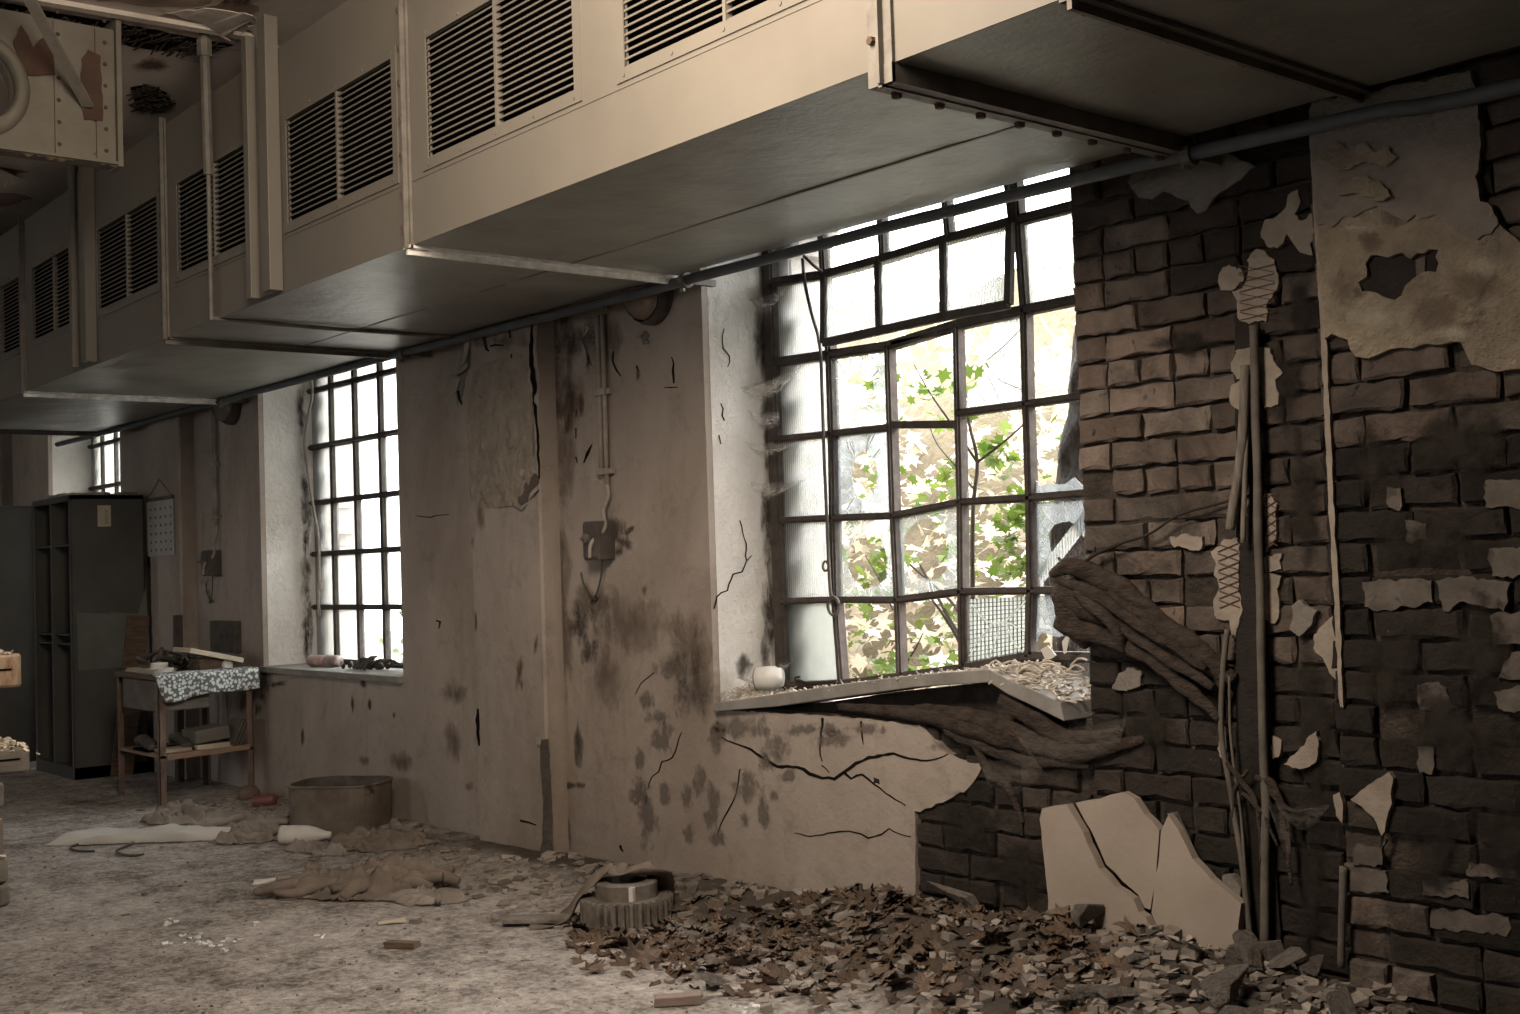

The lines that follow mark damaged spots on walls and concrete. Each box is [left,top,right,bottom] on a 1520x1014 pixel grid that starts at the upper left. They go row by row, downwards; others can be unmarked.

peeling [96,0,259,47]
spalling [1361,249,1438,300]
flaking render [1483,479,1520,509]
crack [713,520,752,609]
damp [560,540,644,683]
damp [738,573,774,676]
flaking render [1362,547,1520,713]
damp [631,693,884,845]
crack [718,718,948,839]
flaking render [1416,746,1436,775]
flaking render [1347,839,1390,894]
flaking render [1422,862,1518,937]